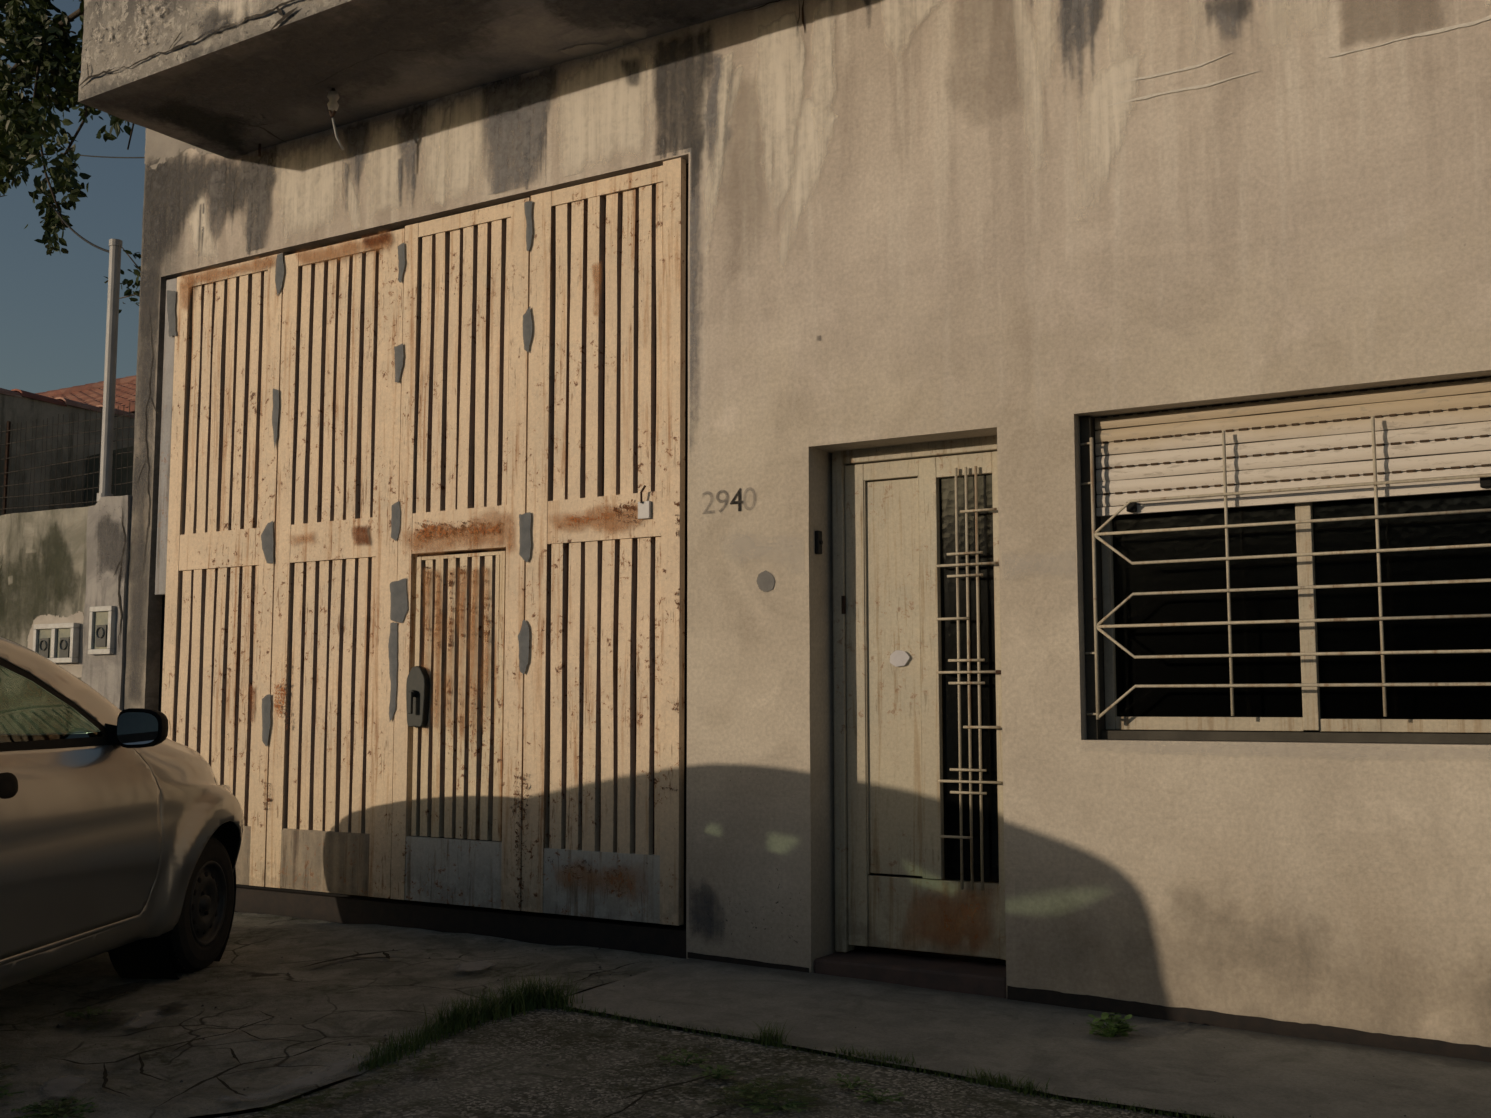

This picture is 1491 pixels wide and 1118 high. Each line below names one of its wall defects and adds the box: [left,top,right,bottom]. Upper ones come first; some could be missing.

crack [78,0,297,87]
water stain [1013,0,1139,205]
corrosion [298,233,390,262]
water stain [121,0,835,698]
water stain [42,525,77,598]
corrosion [409,519,512,548]
corrosion [424,566,489,776]
crack [46,1011,378,1107]
crack [603,1072,722,1118]